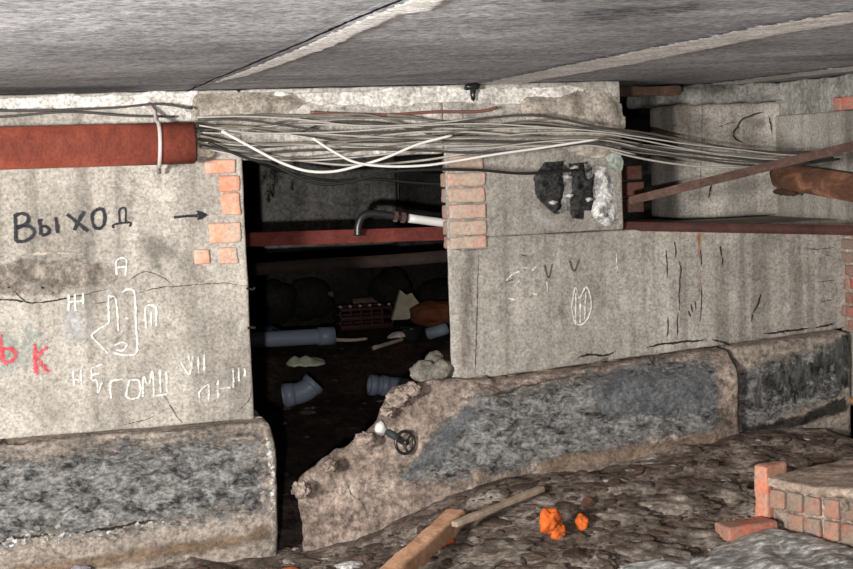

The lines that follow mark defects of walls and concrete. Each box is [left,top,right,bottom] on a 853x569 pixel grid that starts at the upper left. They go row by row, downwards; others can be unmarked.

crack [185,0,402,92]
flaking render [212,0,444,84]
rust [773,188,797,196]
crack [0,271,242,304]